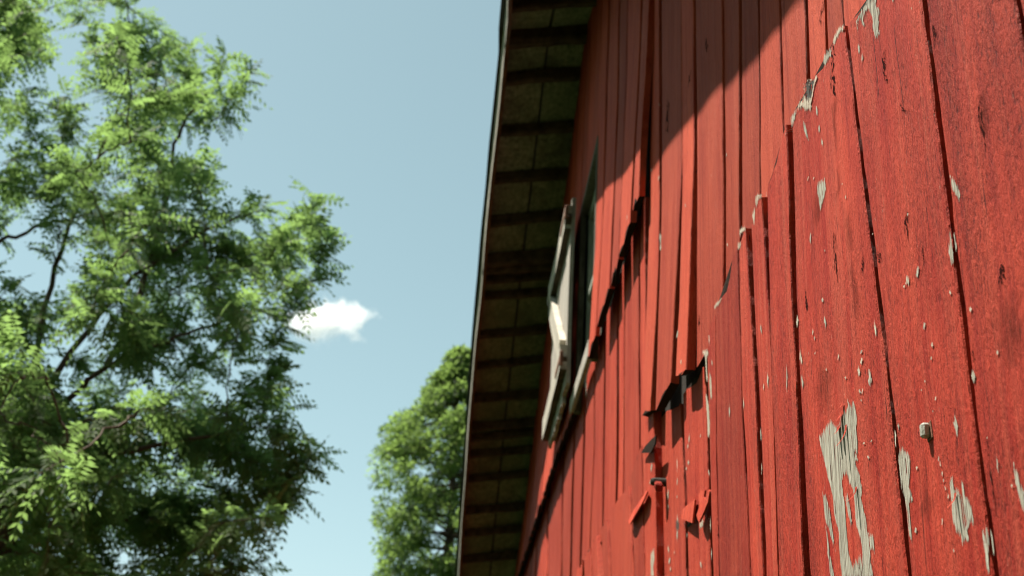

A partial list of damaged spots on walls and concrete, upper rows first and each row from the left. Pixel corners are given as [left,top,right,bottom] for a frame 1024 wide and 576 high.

spalling [798,76,817,111]
peeling [807,177,826,209]
peeling [819,350,874,576]
peeling [895,425,918,539]
peeling [938,456,994,571]